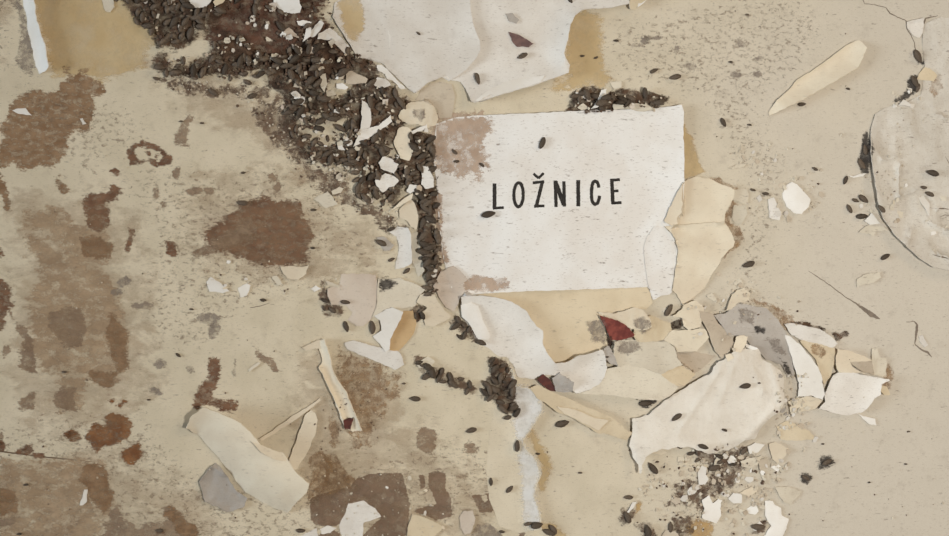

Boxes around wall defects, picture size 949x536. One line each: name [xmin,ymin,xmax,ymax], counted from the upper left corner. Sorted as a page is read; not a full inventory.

peeling [23,0,156,83]
peeling [303,0,646,161]
water stain [0,66,106,211]
water stain [127,116,193,167]
peeling [847,17,949,270]
water stain [0,168,129,414]
water stain [165,241,177,257]
water stain [193,195,314,268]
water stain [192,357,238,413]
peeling [311,161,874,536]
water stain [0,440,199,536]
peeling [301,492,381,536]